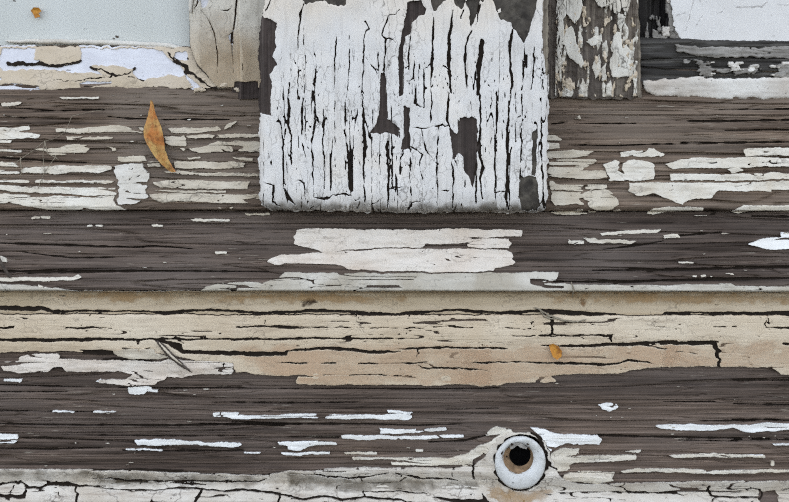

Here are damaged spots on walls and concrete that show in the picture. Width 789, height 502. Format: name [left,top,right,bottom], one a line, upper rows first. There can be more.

crack [167,0,243,90]
peeling [398,0,642,100]
crack [266,0,564,210]
peeling [0,119,260,219]
peeling [518,129,789,216]
crack [0,242,231,274]
peeling [267,228,522,273]
crack [553,265,789,284]
peeling [1,347,234,395]
crack [0,295,789,389]
crack [0,384,573,502]
peeling [213,410,529,466]